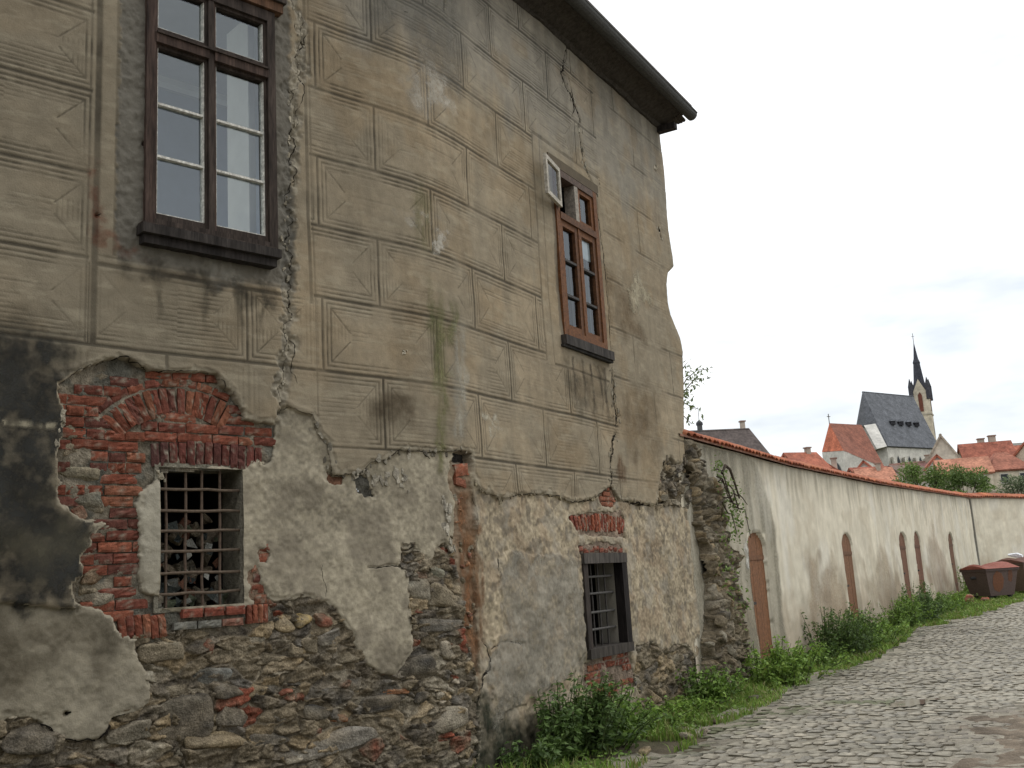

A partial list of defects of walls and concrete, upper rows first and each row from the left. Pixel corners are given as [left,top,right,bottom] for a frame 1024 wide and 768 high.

crack [277,2,317,422]
crack [560,50,648,506]
flaking render [54,359,276,643]